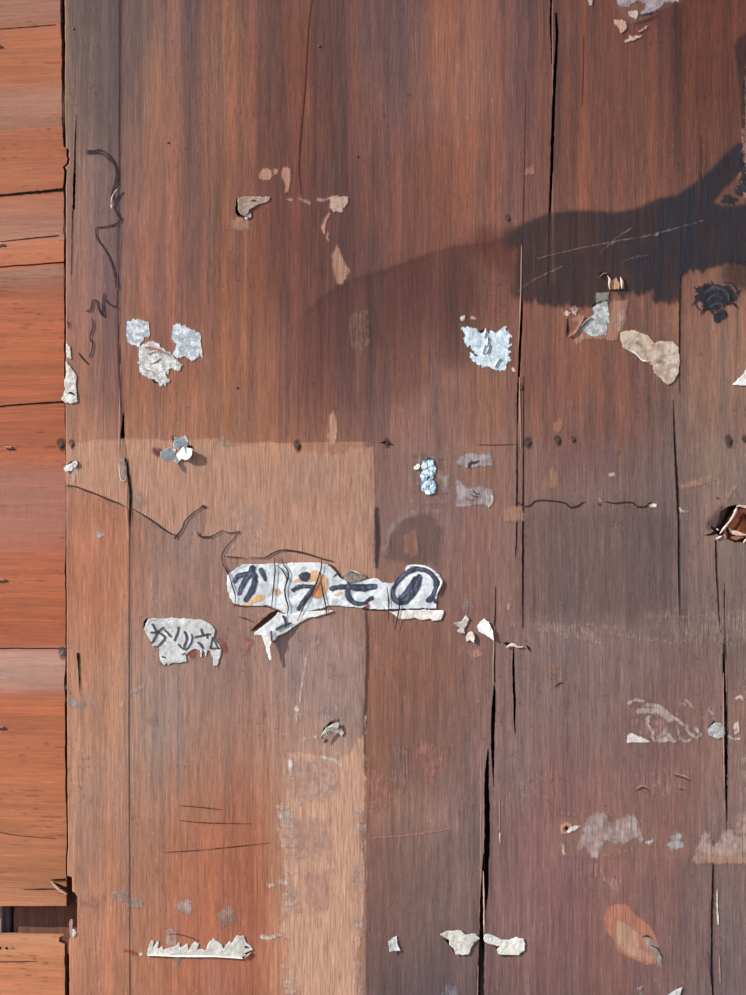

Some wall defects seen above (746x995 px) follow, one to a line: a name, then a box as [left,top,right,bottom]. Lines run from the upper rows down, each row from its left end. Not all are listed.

peeling [614,0,678,42]
crack [548,0,558,215]
leakage [510,33,746,308]
peeling [126,319,203,386]
peeling [460,315,516,372]
crack [476,110,681,995]
spalling [707,504,746,543]